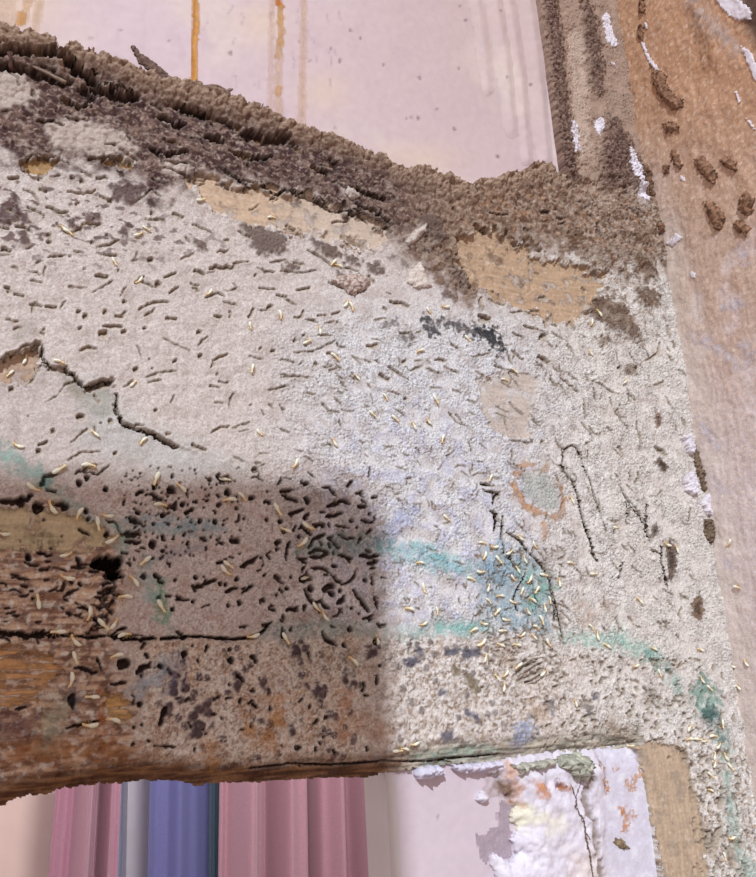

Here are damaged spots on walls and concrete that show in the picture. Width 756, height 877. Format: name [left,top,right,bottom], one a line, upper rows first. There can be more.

rust [191,0,199,81]
rust [276,0,284,57]
peeling [184,169,390,255]
peeling [453,225,608,327]
peeling [0,345,44,384]
crack [40,348,177,449]
crack [560,446,600,562]
crack [0,625,267,641]
crack [252,753,500,768]
peeling [632,741,709,877]